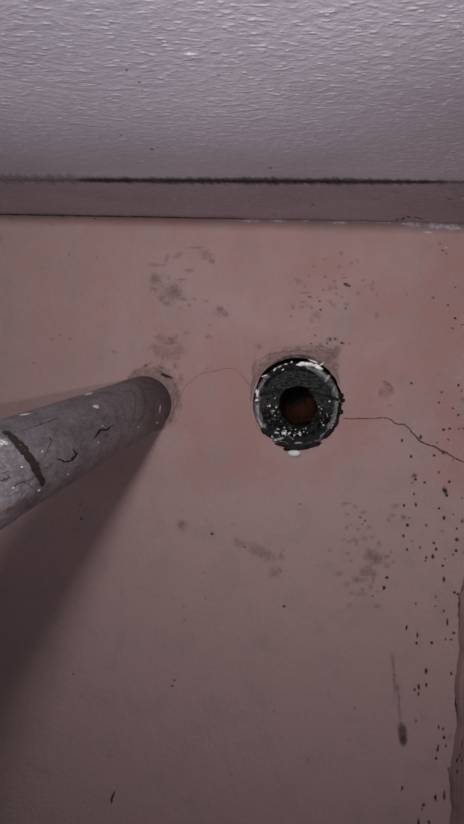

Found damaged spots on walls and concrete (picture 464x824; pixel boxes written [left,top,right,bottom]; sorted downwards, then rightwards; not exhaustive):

crack [345,417,463,462]